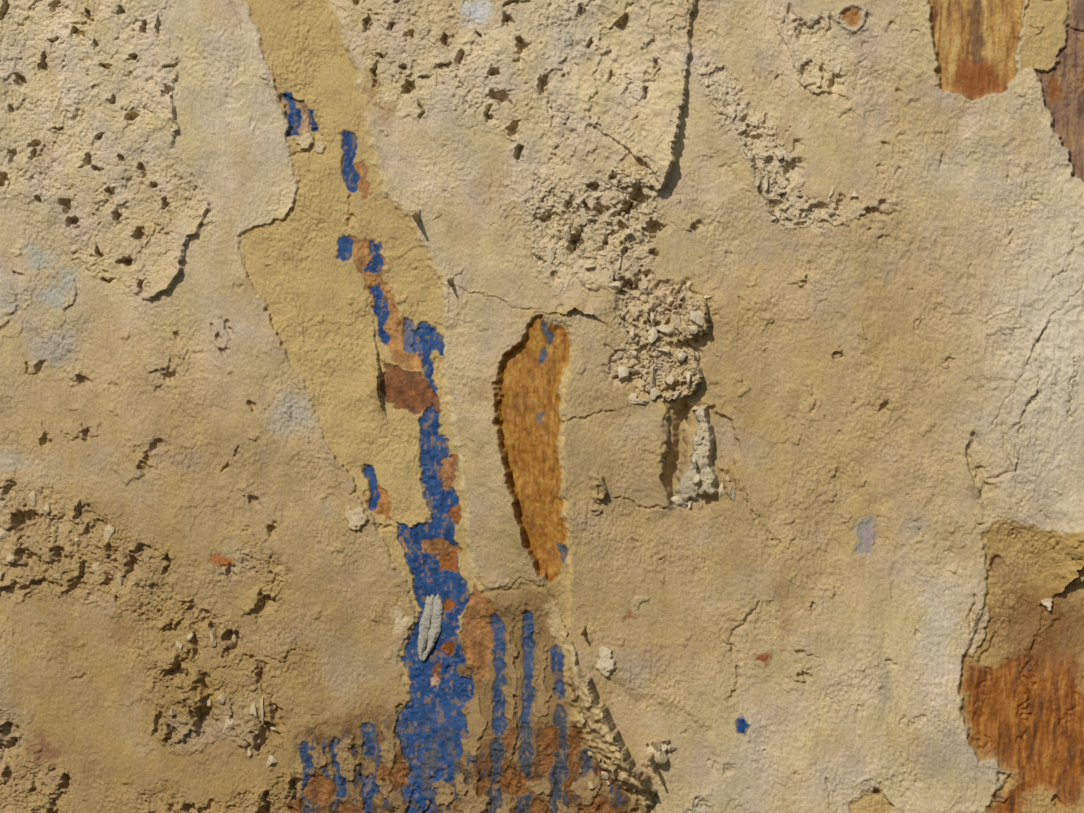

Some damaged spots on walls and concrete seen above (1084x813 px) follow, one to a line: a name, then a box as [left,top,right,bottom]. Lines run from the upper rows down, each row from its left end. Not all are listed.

flaking render [0,0,741,813]
spalling [739,113,769,143]